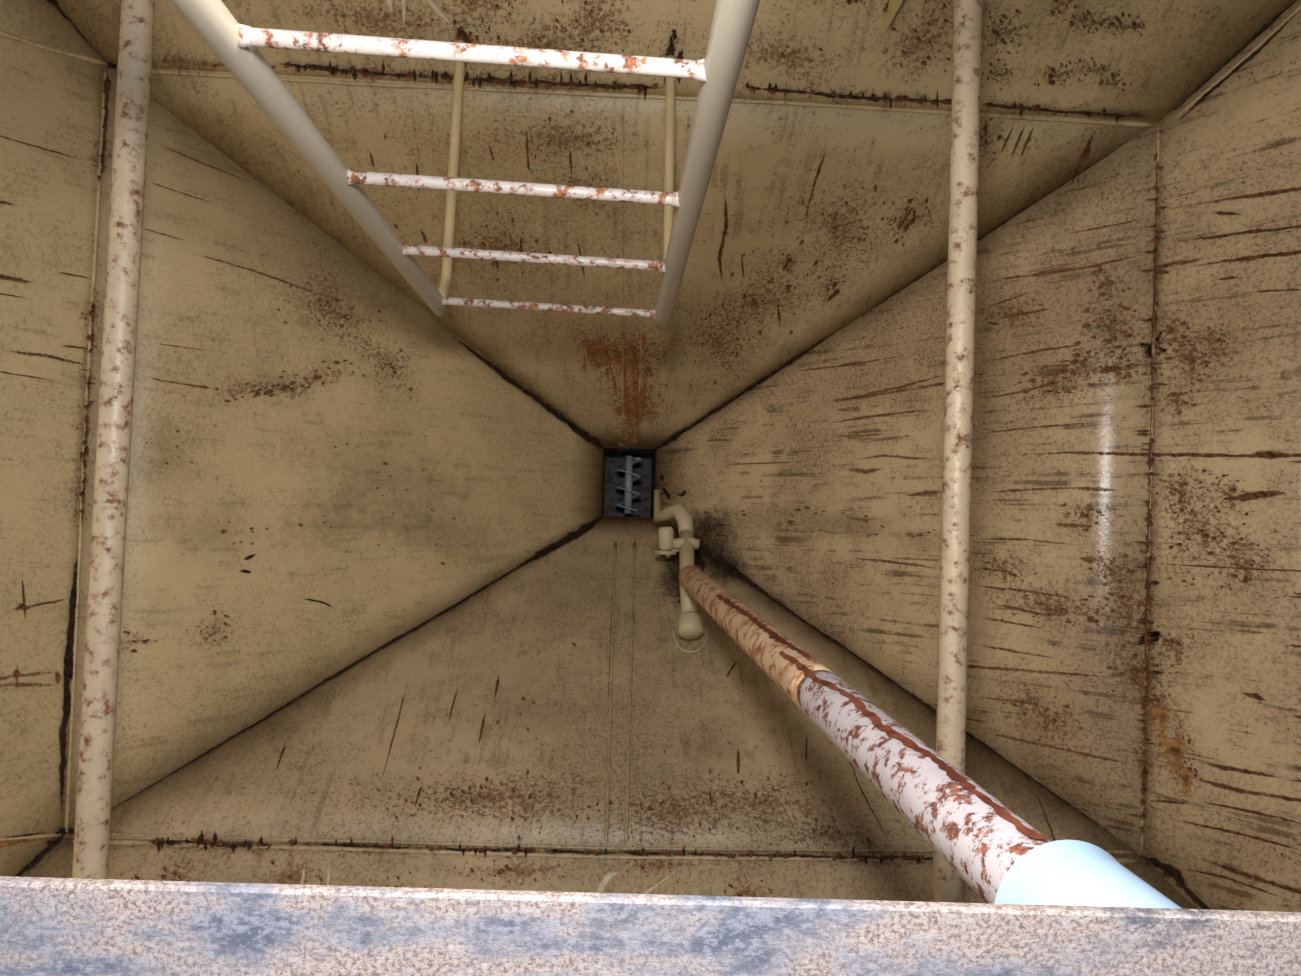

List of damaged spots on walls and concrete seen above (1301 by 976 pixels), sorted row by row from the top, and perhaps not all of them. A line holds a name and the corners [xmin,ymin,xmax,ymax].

corrosion [0,274,30,298]
corrosion [565,153,945,445]
corrosion [11,272,102,523]
corrosion [16,580,63,616]
corrosion [0,667,61,687]